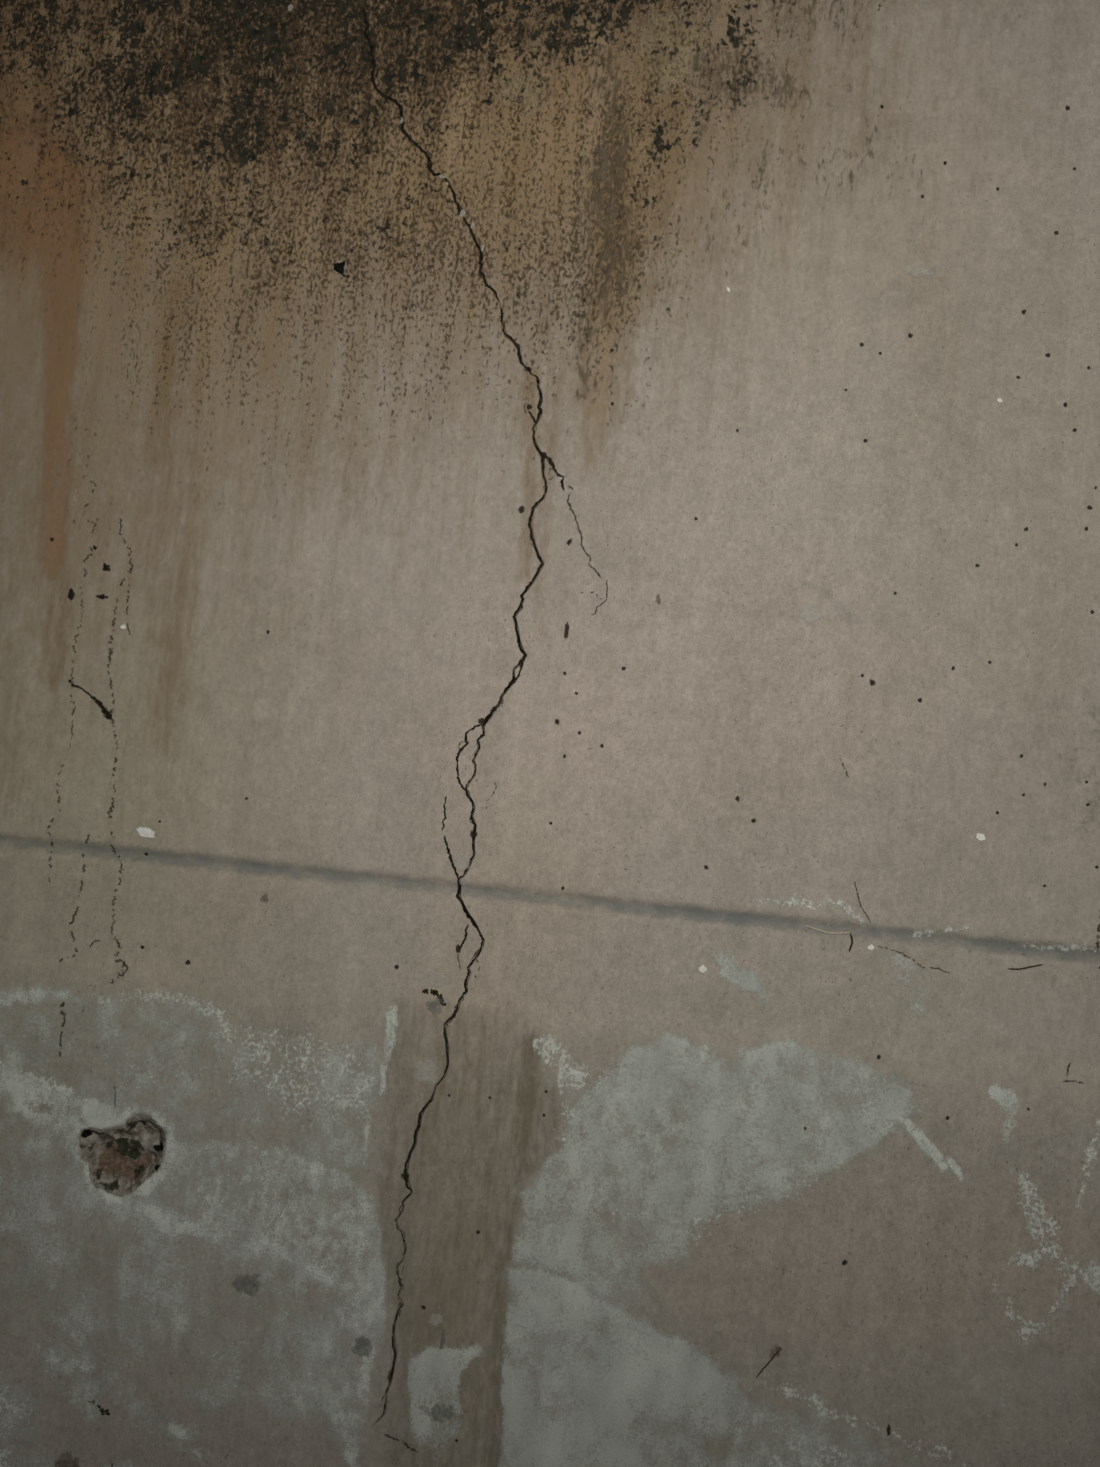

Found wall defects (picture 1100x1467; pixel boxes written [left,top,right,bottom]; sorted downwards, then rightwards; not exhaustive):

water stain [0,0,855,429]
crack [362,8,608,1451]
spalling [0,1054,386,1467]